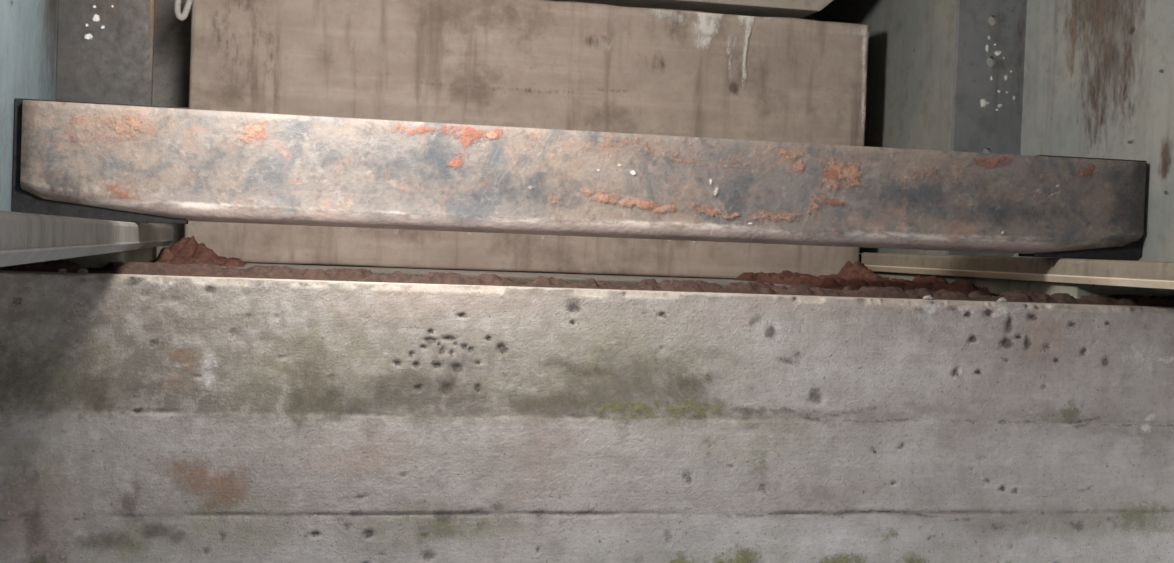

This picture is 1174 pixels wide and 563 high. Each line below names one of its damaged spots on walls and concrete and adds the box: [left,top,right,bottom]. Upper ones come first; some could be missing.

water stain [653,9,723,48]
water stain [727,15,754,92]
corrosion [397,124,502,168]
corrosion [582,188,674,213]
corrosion [692,157,861,221]